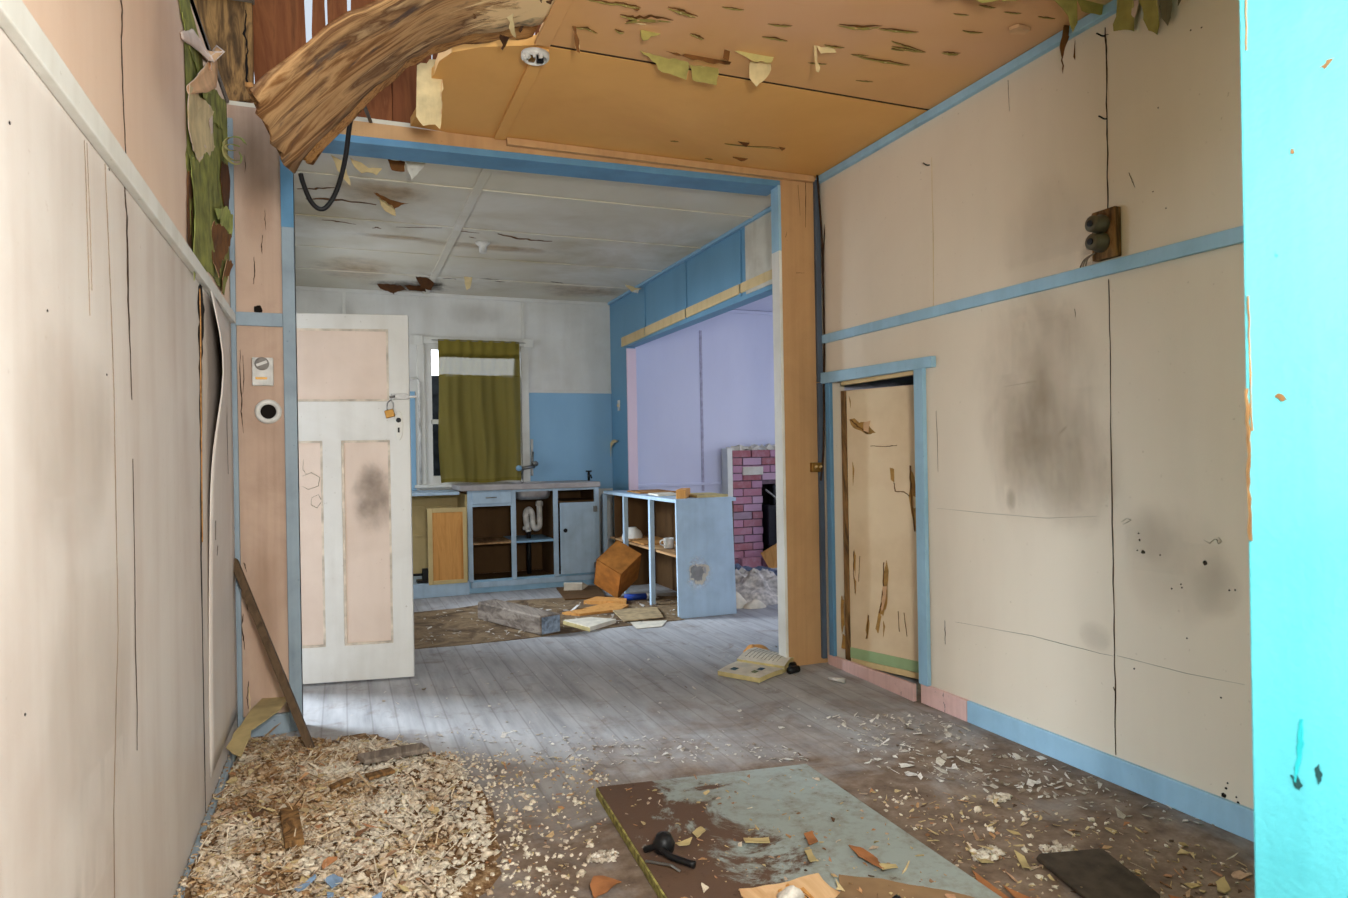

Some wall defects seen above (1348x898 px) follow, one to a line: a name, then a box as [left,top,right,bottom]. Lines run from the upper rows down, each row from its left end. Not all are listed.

peeling [416,59,443,129]
peeling [499,13,524,50]
peeling [634,8,774,87]
peeling [814,45,836,73]
peeling [1054,0,1181,73]
peeling [179,0,247,295]
peeling [849,397,897,447]
peeling [890,466,916,531]
peeling [841,551,860,649]
peeling [866,560,907,639]